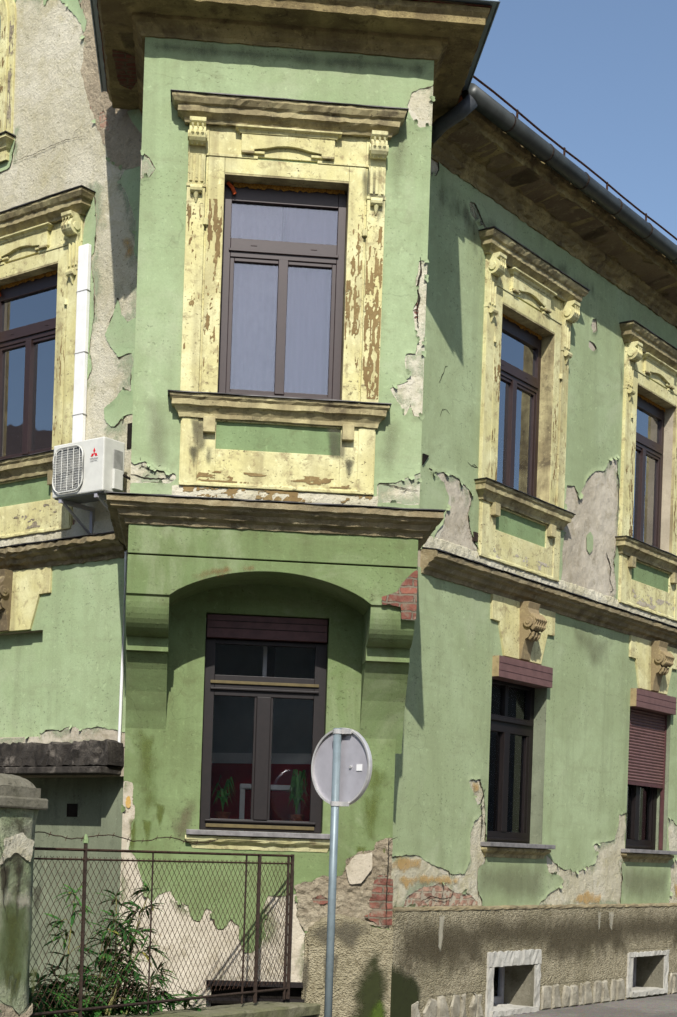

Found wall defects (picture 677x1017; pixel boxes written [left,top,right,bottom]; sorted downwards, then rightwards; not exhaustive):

flaking render [0,0,477,551]
flaking render [504,168,608,242]
flaking render [493,403,635,598]